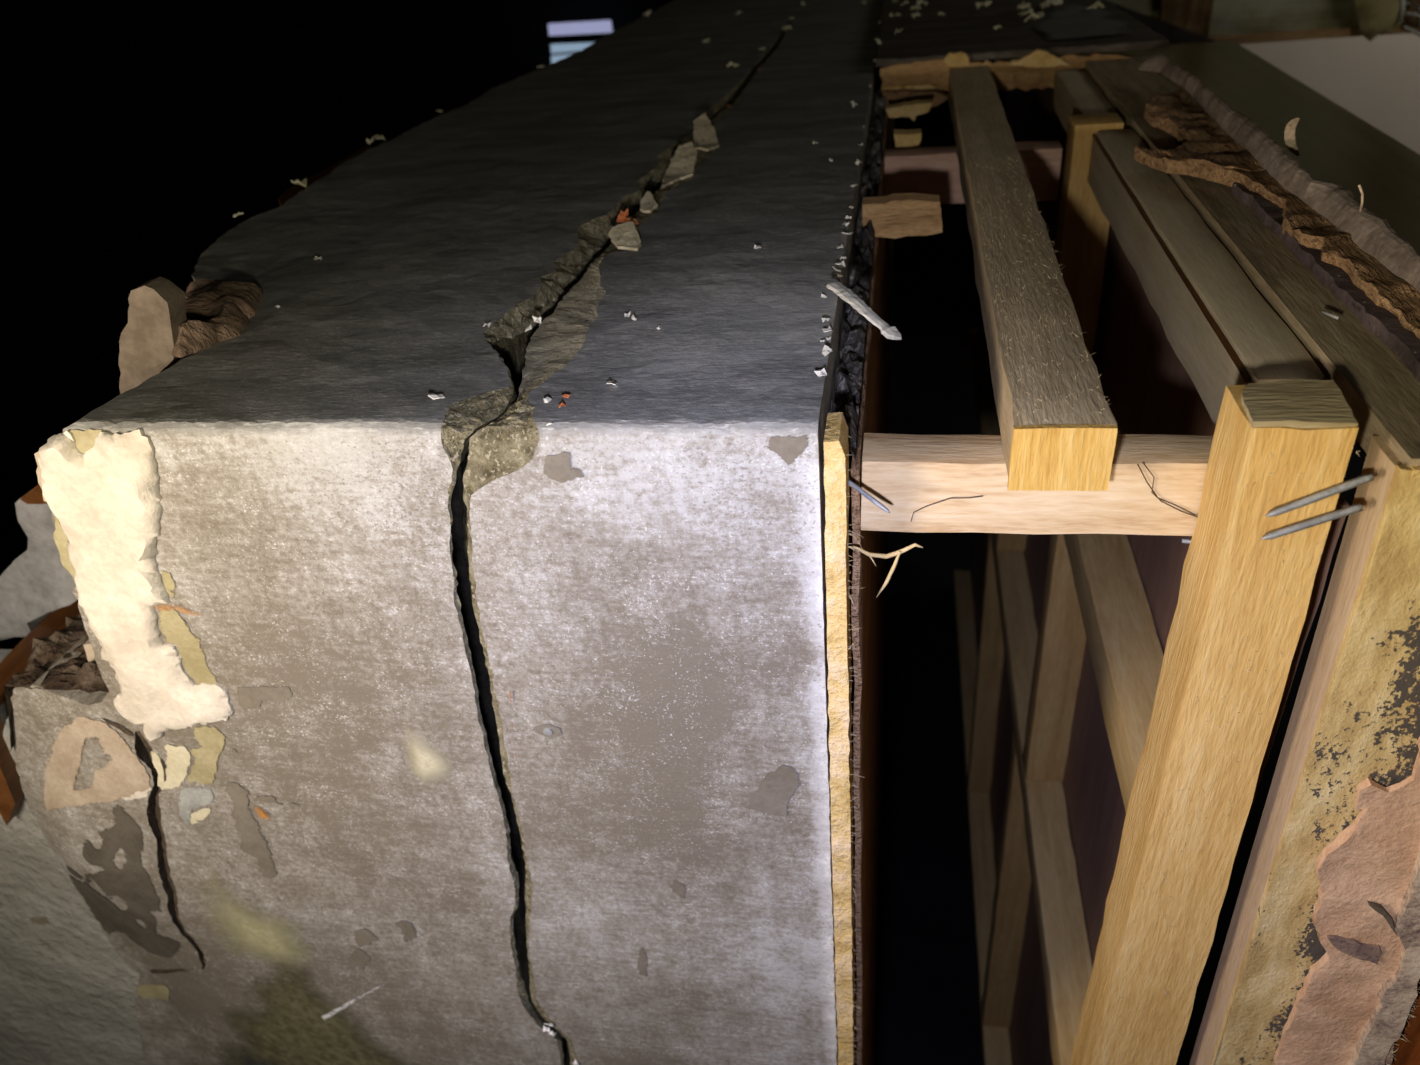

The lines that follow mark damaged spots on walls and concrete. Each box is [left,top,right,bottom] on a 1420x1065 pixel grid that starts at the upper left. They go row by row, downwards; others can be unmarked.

crack [102,718,206,974]
flaking render [34,429,300,958]
spalling [172,278,263,358]
crack [448,21,790,1065]